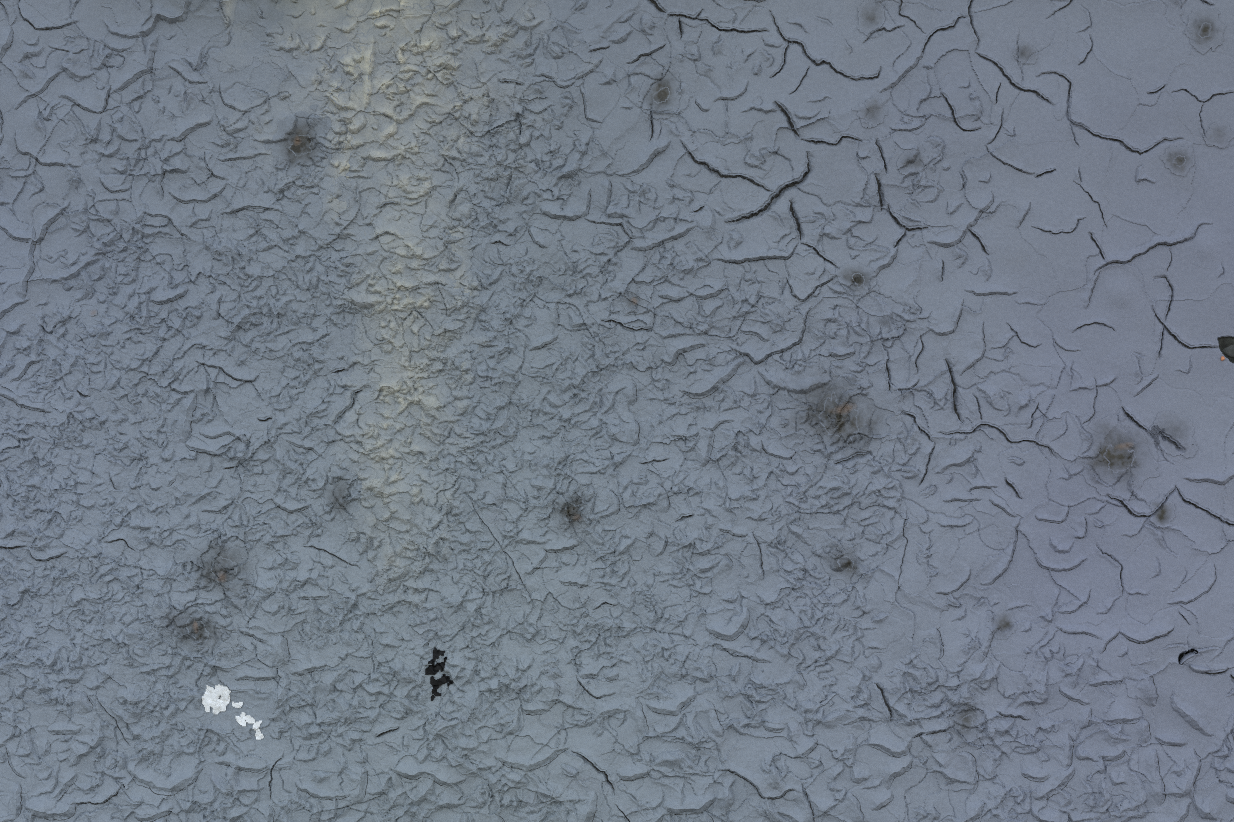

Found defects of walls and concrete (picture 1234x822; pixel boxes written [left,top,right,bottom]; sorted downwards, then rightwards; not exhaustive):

crack [585,0,1234,365]
crack [331,366,365,425]
crack [882,335,1058,487]
crack [1122,405,1184,450]
crack [1006,477,1023,499]
crack [1106,484,1234,526]
crack [0,542,67,562]
crack [1206,667,1234,679]
crack [873,683,892,723]
crack [374,726,399,737]
crack [571,750,634,822]
crack [718,766,815,822]